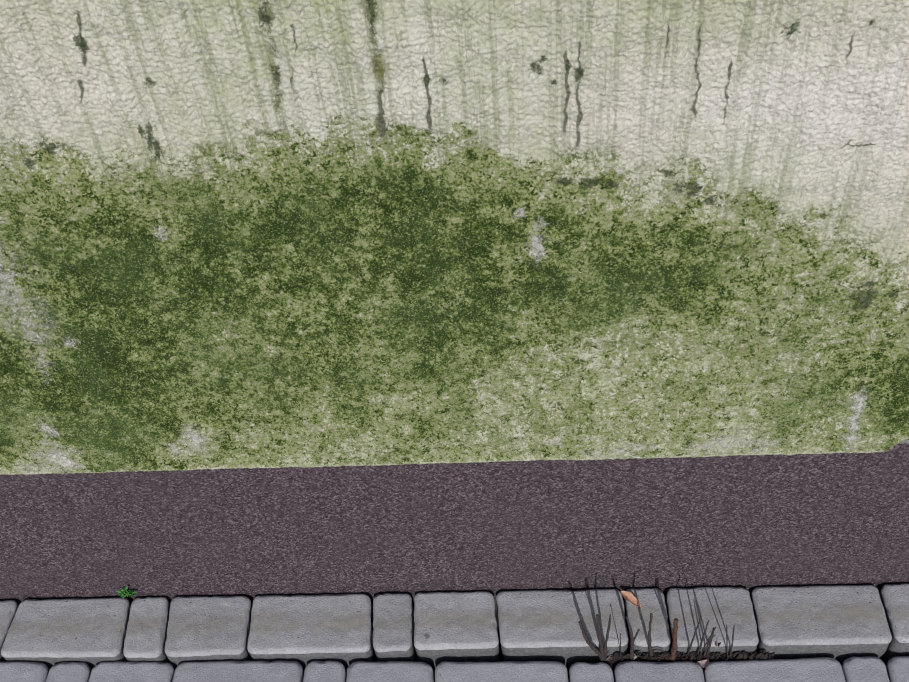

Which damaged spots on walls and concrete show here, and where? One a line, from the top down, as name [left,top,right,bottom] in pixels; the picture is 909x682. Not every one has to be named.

damp [563,42,585,147]
damp [846,393,867,450]